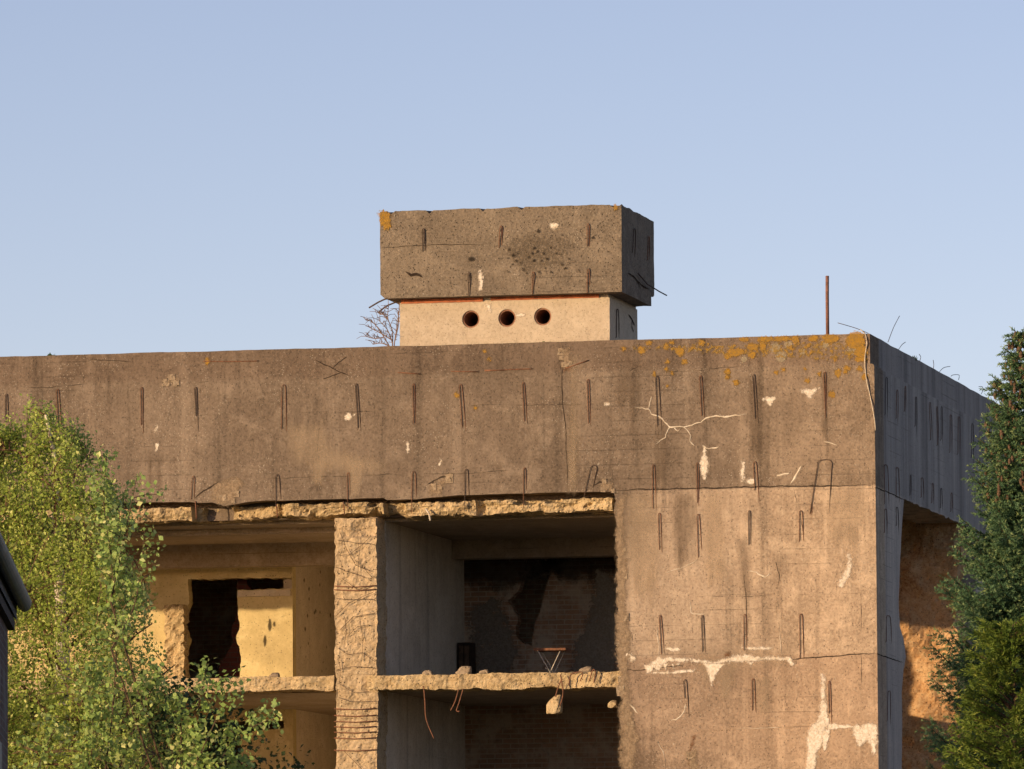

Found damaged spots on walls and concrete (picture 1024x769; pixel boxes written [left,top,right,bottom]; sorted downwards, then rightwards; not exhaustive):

crack [637,397,744,449]
water stain [700,445,708,480]
flaking render [163,604,190,679]
water stain [626,646,794,686]
spalling [334,708,377,752]
water stain [805,674,878,769]